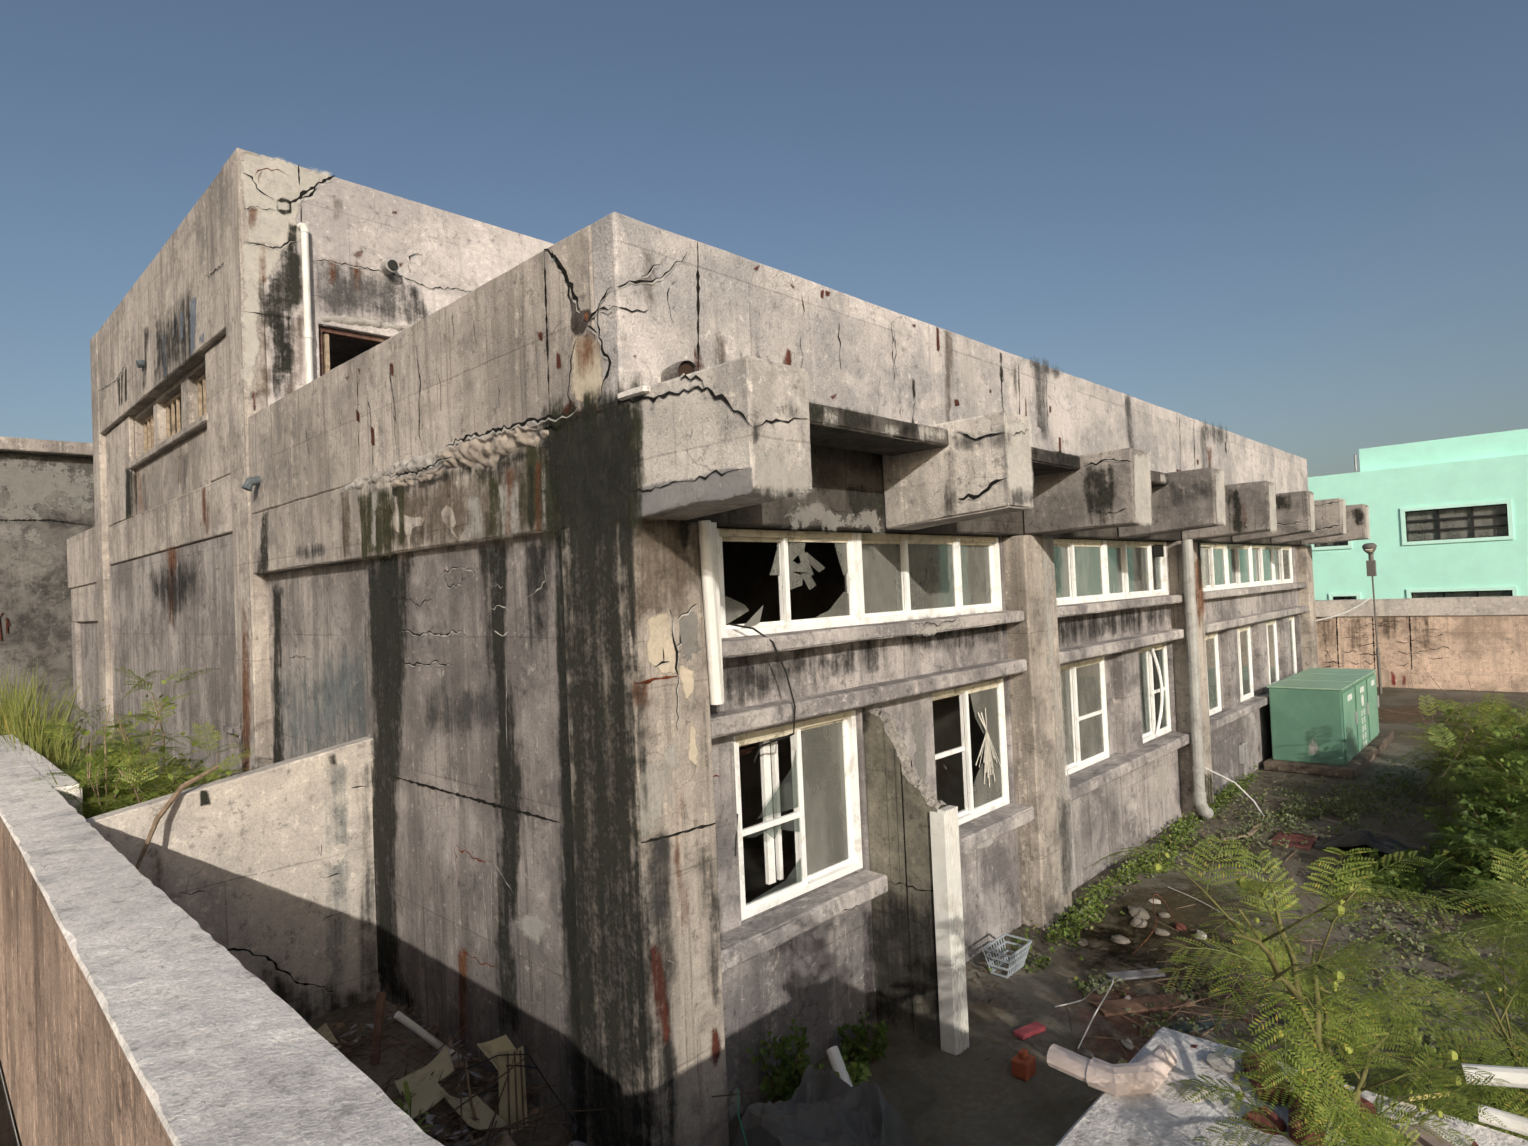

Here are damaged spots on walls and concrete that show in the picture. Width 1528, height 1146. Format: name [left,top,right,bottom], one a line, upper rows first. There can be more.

crack [207,168,477,344]
damp [257,225,427,396]
crack [356,249,807,479]
peeling [571,298,603,402]
crack [626,468,747,492]
crack [958,477,1008,502]
damp [1057,452,1114,522]
damp [1125,397,1152,525]
damp [258,513,284,763]
peeling [647,612,698,699]
damp [272,379,696,1146]
peeling [913,703,926,780]